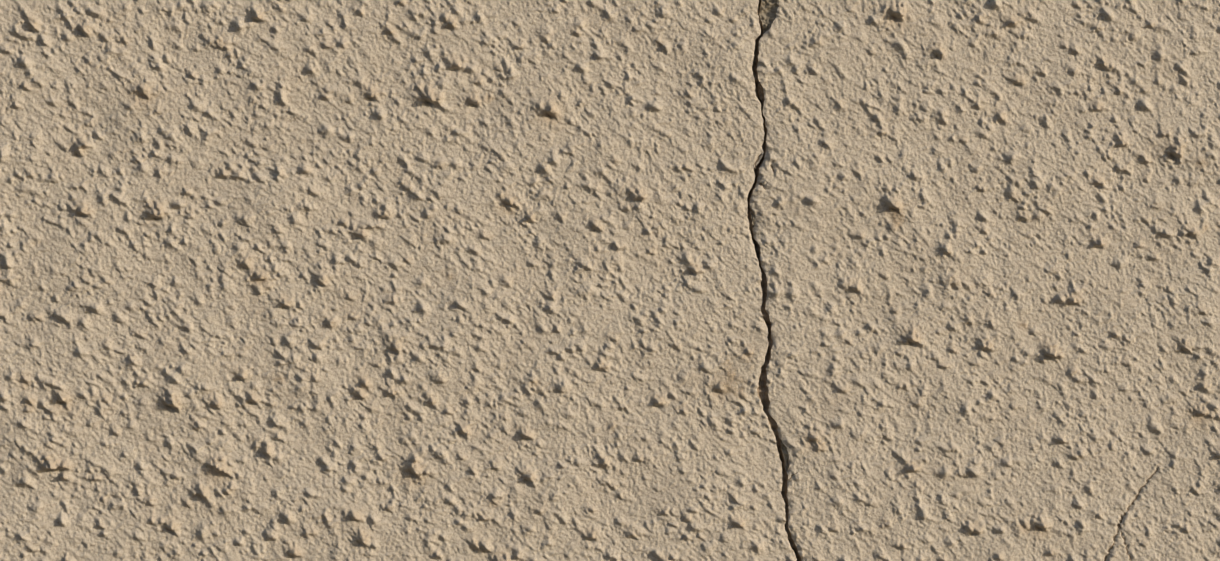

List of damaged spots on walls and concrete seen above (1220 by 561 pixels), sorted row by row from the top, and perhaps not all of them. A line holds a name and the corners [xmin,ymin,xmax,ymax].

crack [747,0,802,561]